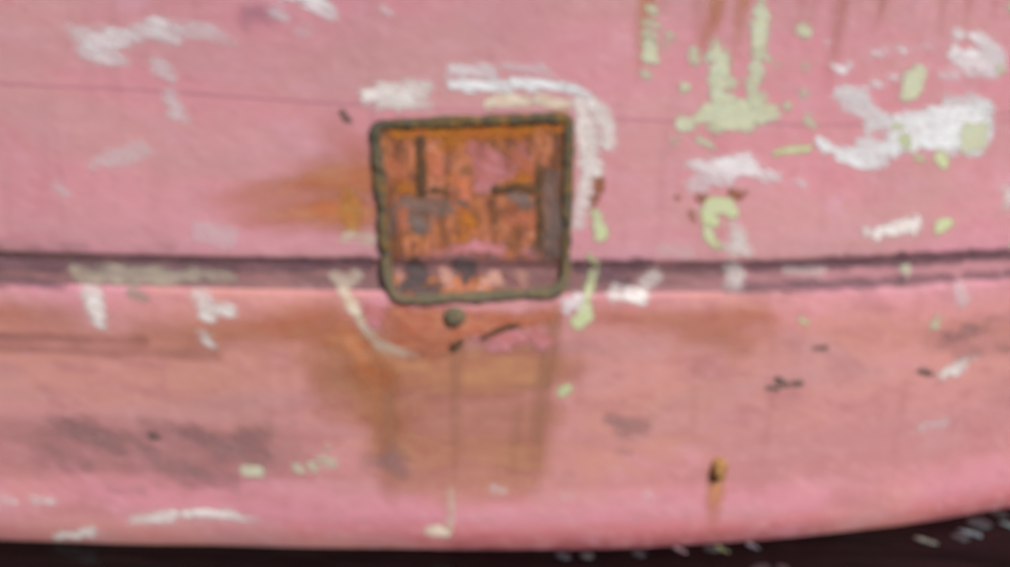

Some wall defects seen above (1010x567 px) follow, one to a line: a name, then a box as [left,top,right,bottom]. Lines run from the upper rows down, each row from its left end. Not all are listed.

peeling [279,0,338,20]
peeling [75,16,184,66]
peeling [945,29,1008,78]
peeling [358,80,433,111]
peeling [447,61,617,242]
peeling [675,0,792,256]
peeling [772,62,996,172]
peeling [934,218,953,235]
corrosion [274,123,564,399]
peeling [432,237,506,290]
peeling [562,253,599,330]
peeling [608,286,650,306]